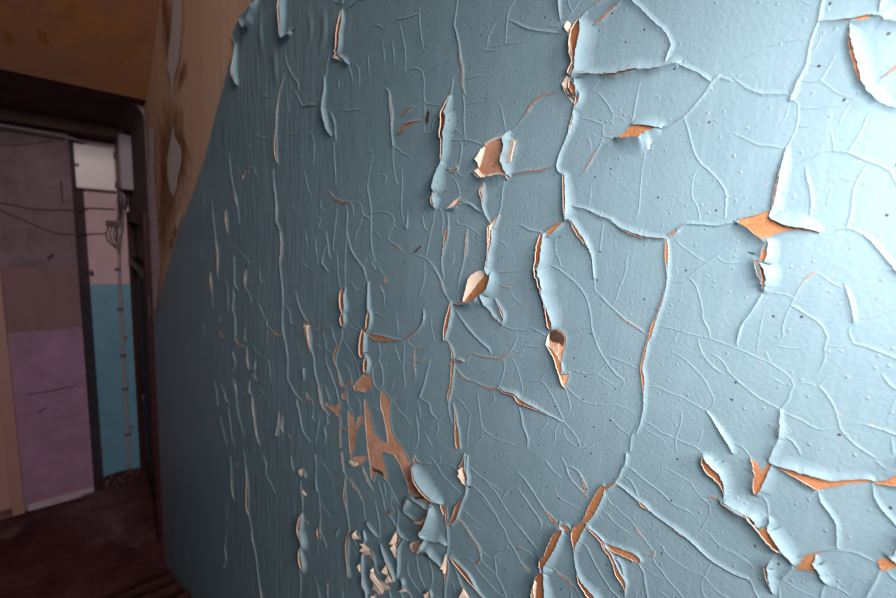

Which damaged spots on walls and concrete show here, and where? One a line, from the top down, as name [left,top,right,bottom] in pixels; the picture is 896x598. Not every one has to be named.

peeling [167,0,182,101]
peeling [231,34,240,87]
peeling [238,0,260,33]
peeling [277,0,300,83]
peeling [167,127,181,196]
peeling [465,16,826,344]
peeling [451,259,572,390]
crack [201,0,896,598]
peeling [324,369,448,598]
peeling [581,521,731,598]
peeling [653,443,896,598]